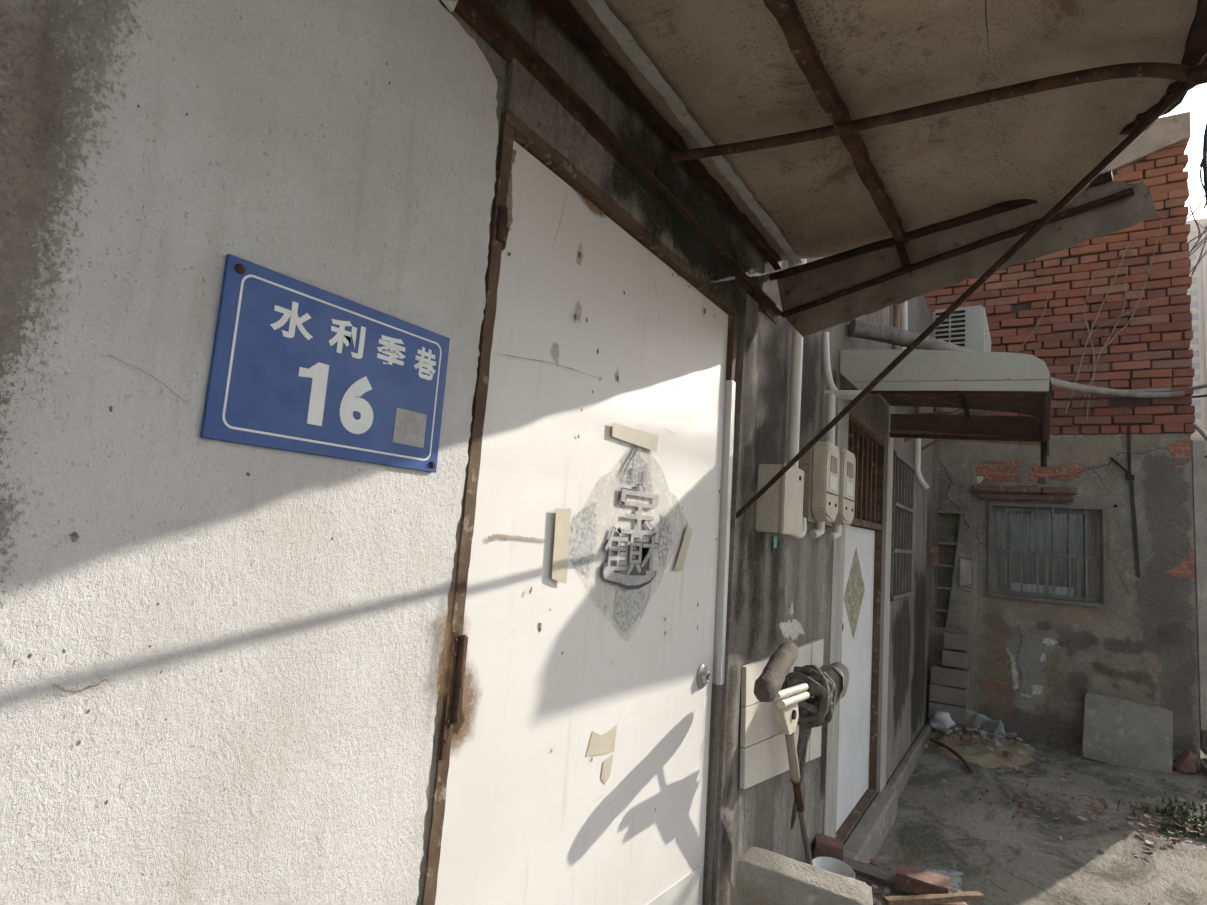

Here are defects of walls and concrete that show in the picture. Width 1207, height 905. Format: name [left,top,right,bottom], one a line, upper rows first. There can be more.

leakage [609,109,828,649]
leakage [800,336,836,430]
flaking render [974,435,1191,484]
corrosion [437,615,451,697]
corrosion [451,669,477,748]
leakage [720,666,755,905]
leakage [803,724,827,838]